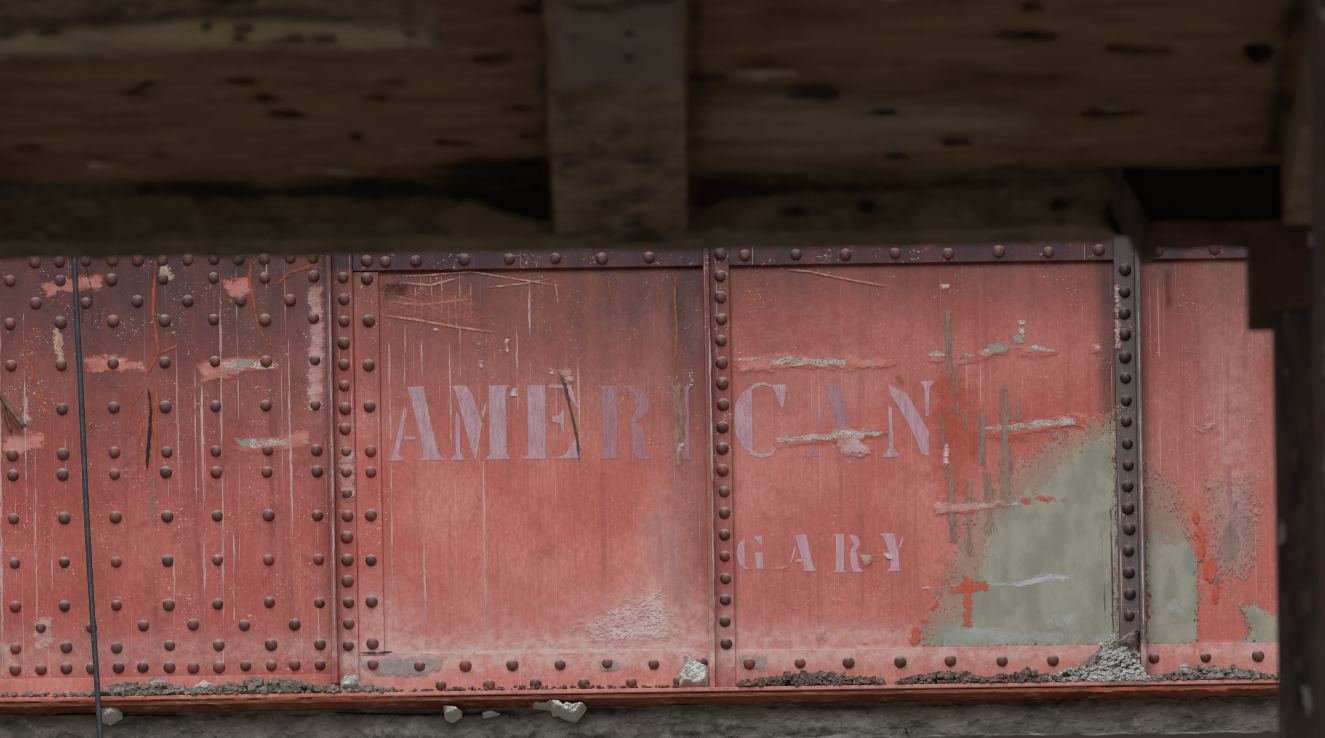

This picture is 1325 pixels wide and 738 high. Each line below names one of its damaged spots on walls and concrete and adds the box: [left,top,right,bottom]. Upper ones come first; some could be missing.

corrosion [127,263,178,480]
peeling [836,436,872,457]
peeling [903,310,1119,648]
peeling [1138,312,1285,644]